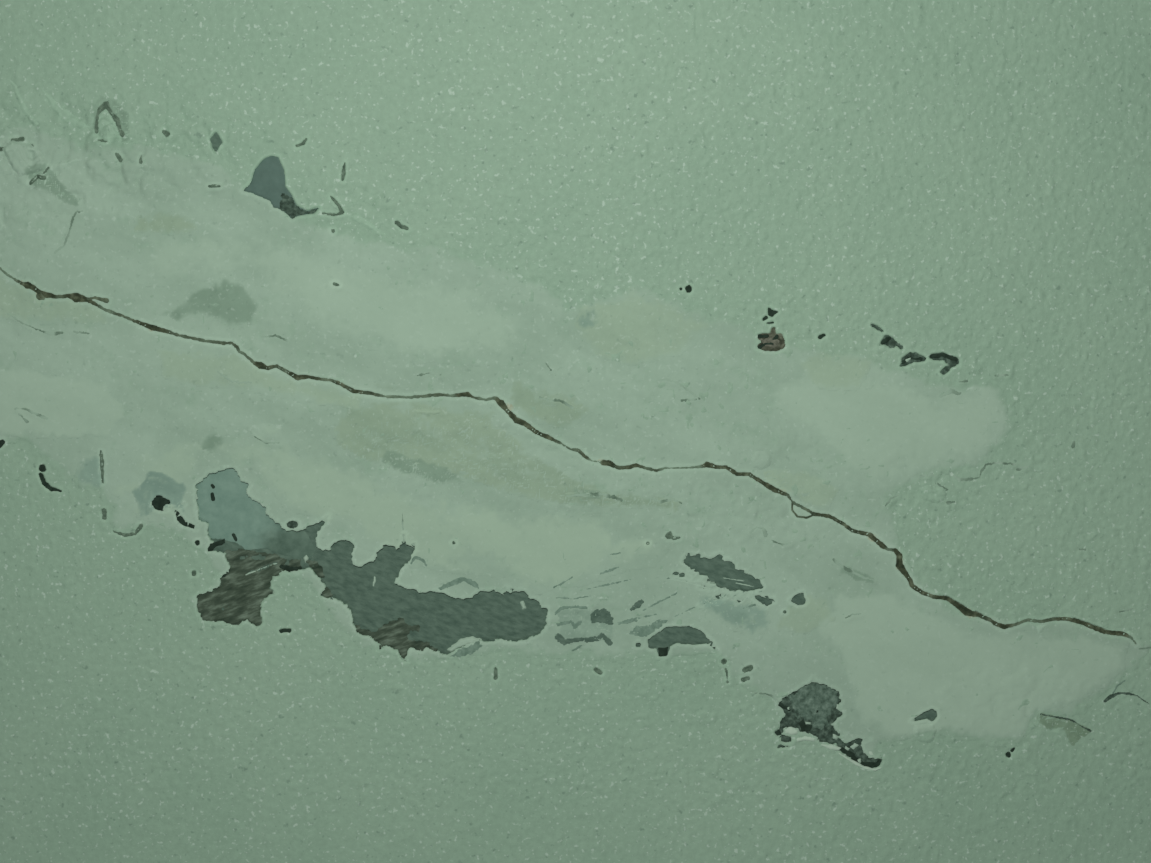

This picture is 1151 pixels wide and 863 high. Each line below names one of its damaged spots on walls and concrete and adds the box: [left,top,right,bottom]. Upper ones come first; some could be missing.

peeling [244,156,319,219]
spalling [870,324,959,375]
crack [0,267,1151,649]
peeling [152,468,806,683]
peeling [775,682,882,771]